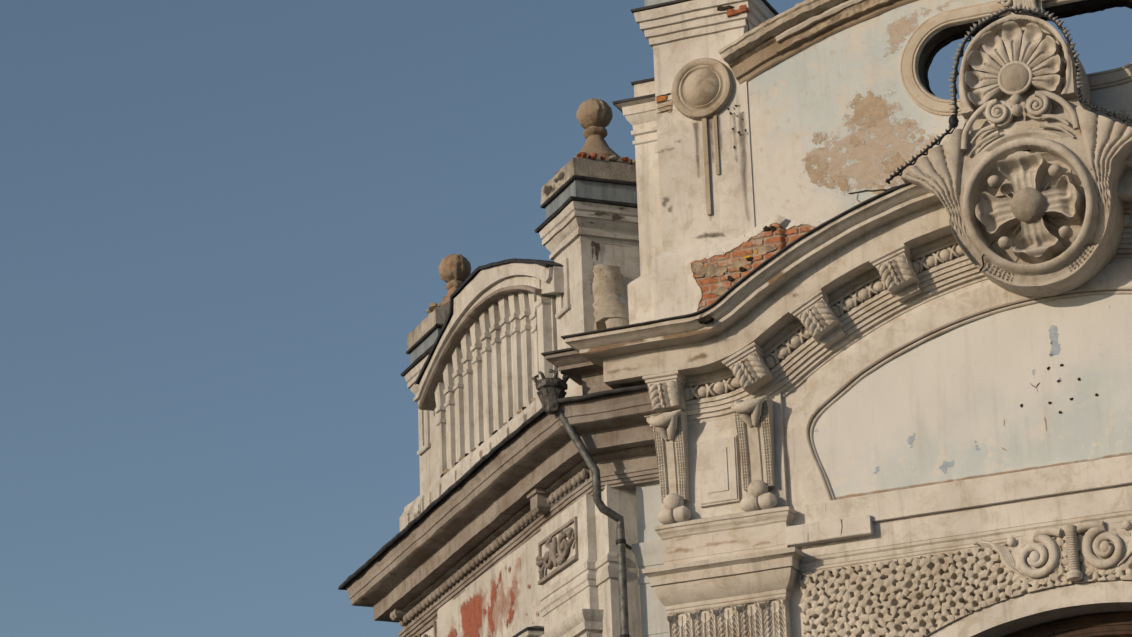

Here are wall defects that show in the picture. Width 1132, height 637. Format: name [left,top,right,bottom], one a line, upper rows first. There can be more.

spalling [775,0,891,53]
peeling [885,3,947,57]
peeling [802,91,937,194]
flaking render [683,215,822,313]